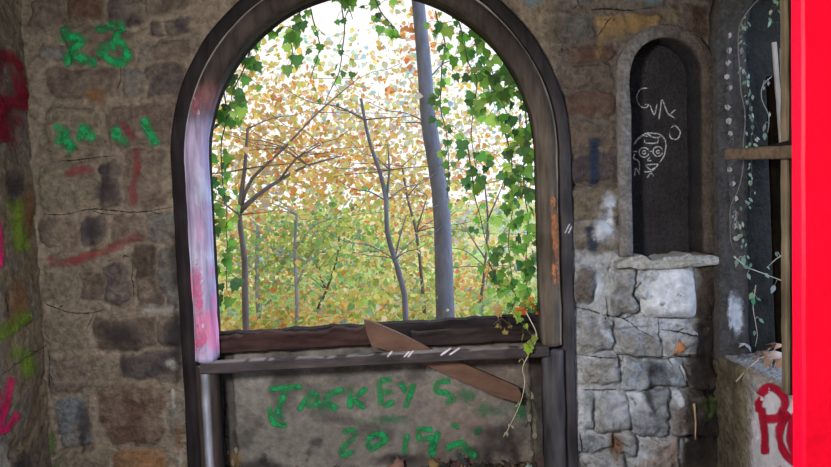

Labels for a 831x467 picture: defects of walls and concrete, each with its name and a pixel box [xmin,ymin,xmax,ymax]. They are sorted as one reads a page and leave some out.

rust [551,196,559,284]
crack [575,283,712,391]